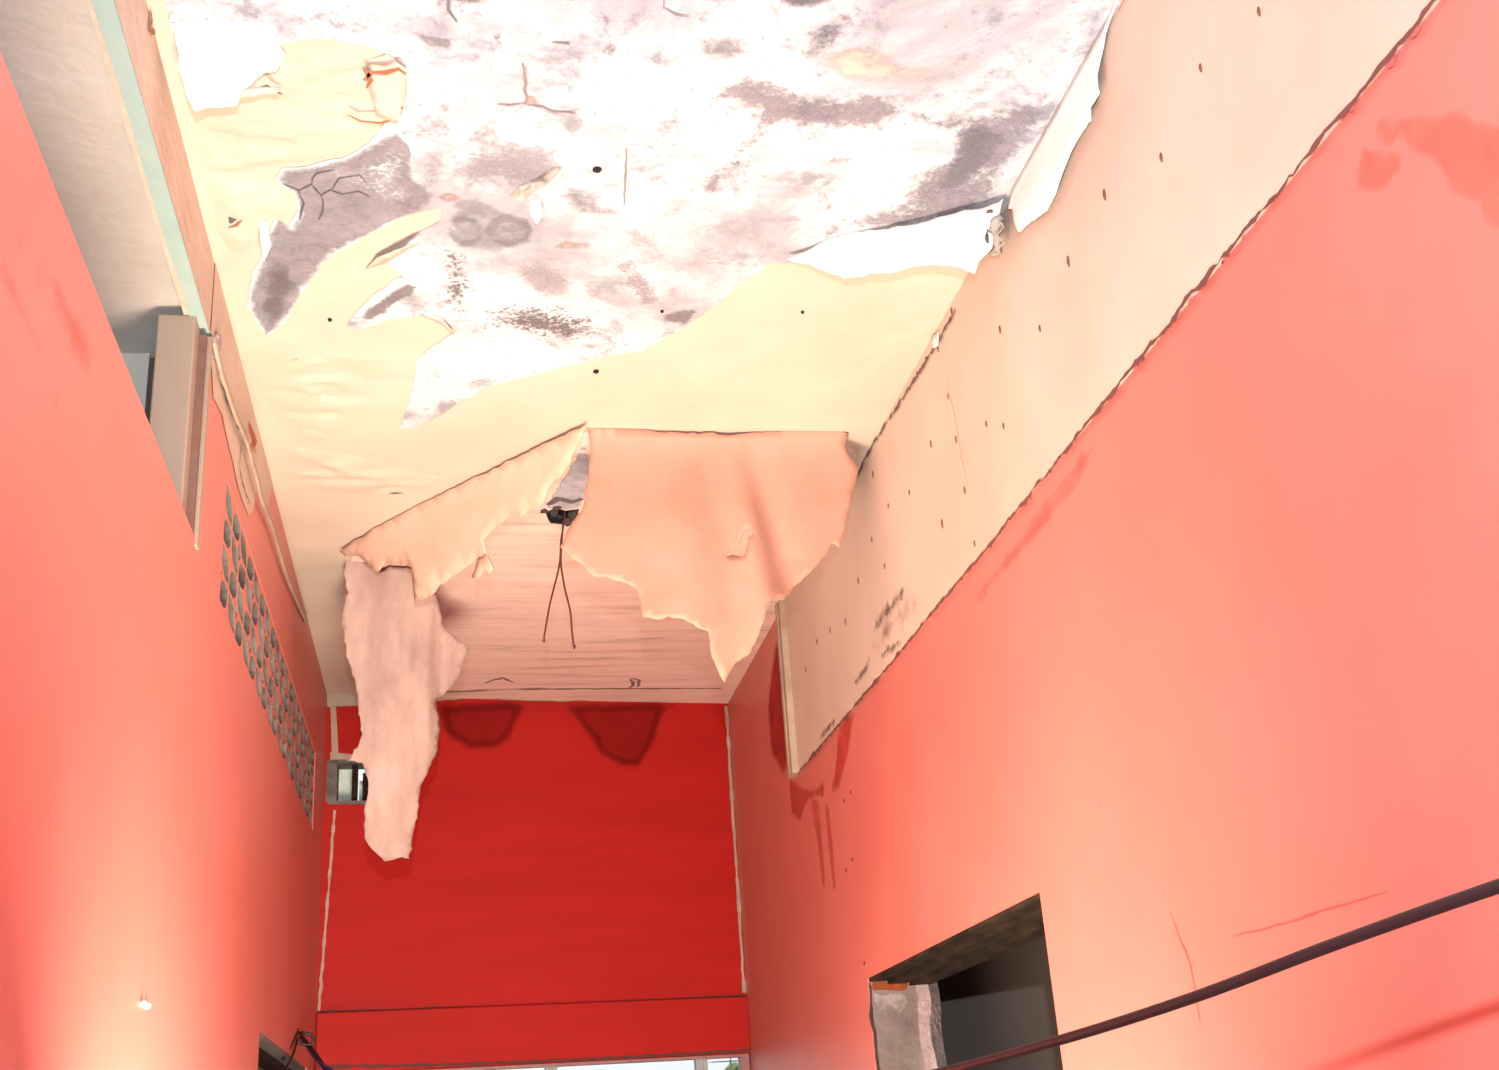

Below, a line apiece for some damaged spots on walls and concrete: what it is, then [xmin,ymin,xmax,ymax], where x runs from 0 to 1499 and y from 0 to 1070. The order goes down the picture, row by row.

water stain [712,81,894,134]
crack [283,170,370,220]
water stain [252,137,428,333]
water stain [447,134,552,311]
peeling [165,0,1122,428]
water stain [858,108,1035,227]
mould [485,268,597,342]
mould [664,310,694,324]
spalling [351,556,411,572]
spalling [435,432,785,704]
water stain [444,705,520,746]
water stain [575,705,663,764]